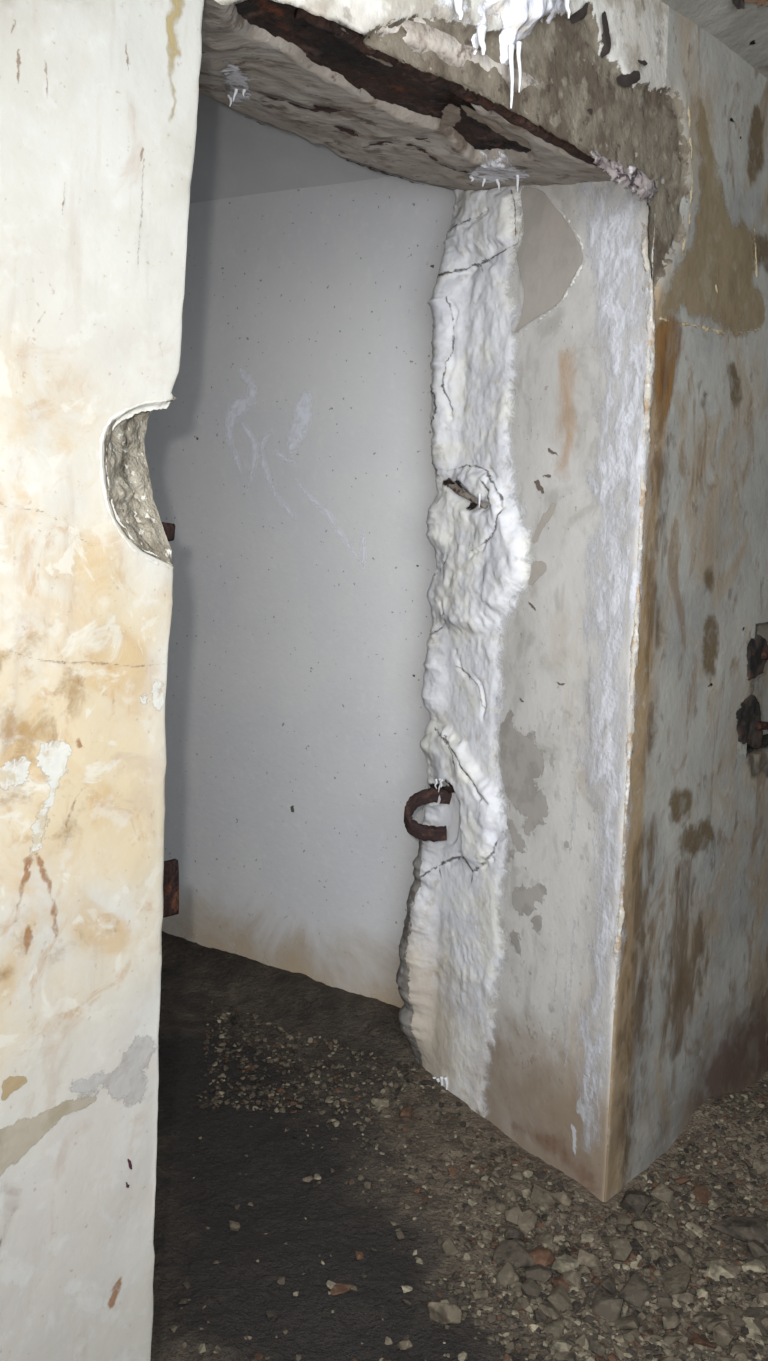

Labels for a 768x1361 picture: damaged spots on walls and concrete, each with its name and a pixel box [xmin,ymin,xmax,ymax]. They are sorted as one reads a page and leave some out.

corrosion [294,7,609,174]
corrosion [265,96,472,175]
spalling [363,1,765,335]
water stain [748,107,763,180]
water stain [730,364,741,405]
spalling [99,396,177,567]
water stain [704,617,718,674]
water stain [0,740,72,852]
crack [435,728,482,800]
crack [421,842,497,882]
water stain [670,791,713,854]
peeling [0,1035,155,1176]